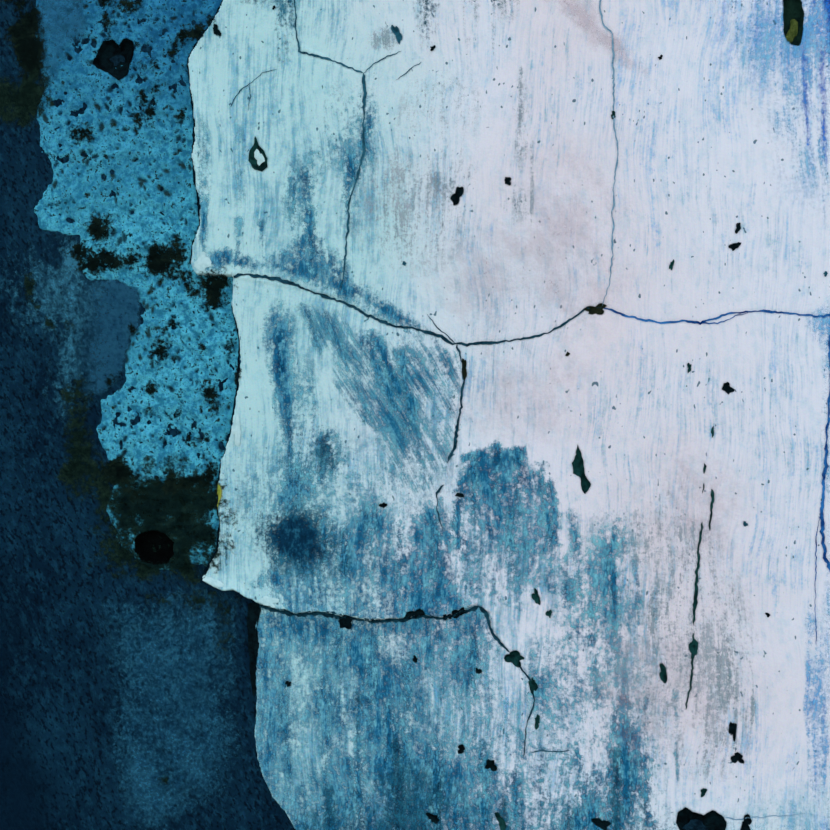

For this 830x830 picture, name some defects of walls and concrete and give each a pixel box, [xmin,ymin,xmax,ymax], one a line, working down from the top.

spalling [106,484,140,559]
leakage [15,213,240,830]
spalling [34,0,241,493]
crack [187,0,223,264]
spalling [189,509,224,587]
crack [204,305,240,575]
peeling [254,149,265,166]
peeling [258,595,279,608]
crack [257,603,569,756]
crack [231,0,830,641]
crack [685,464,714,709]
crack [726,812,806,820]